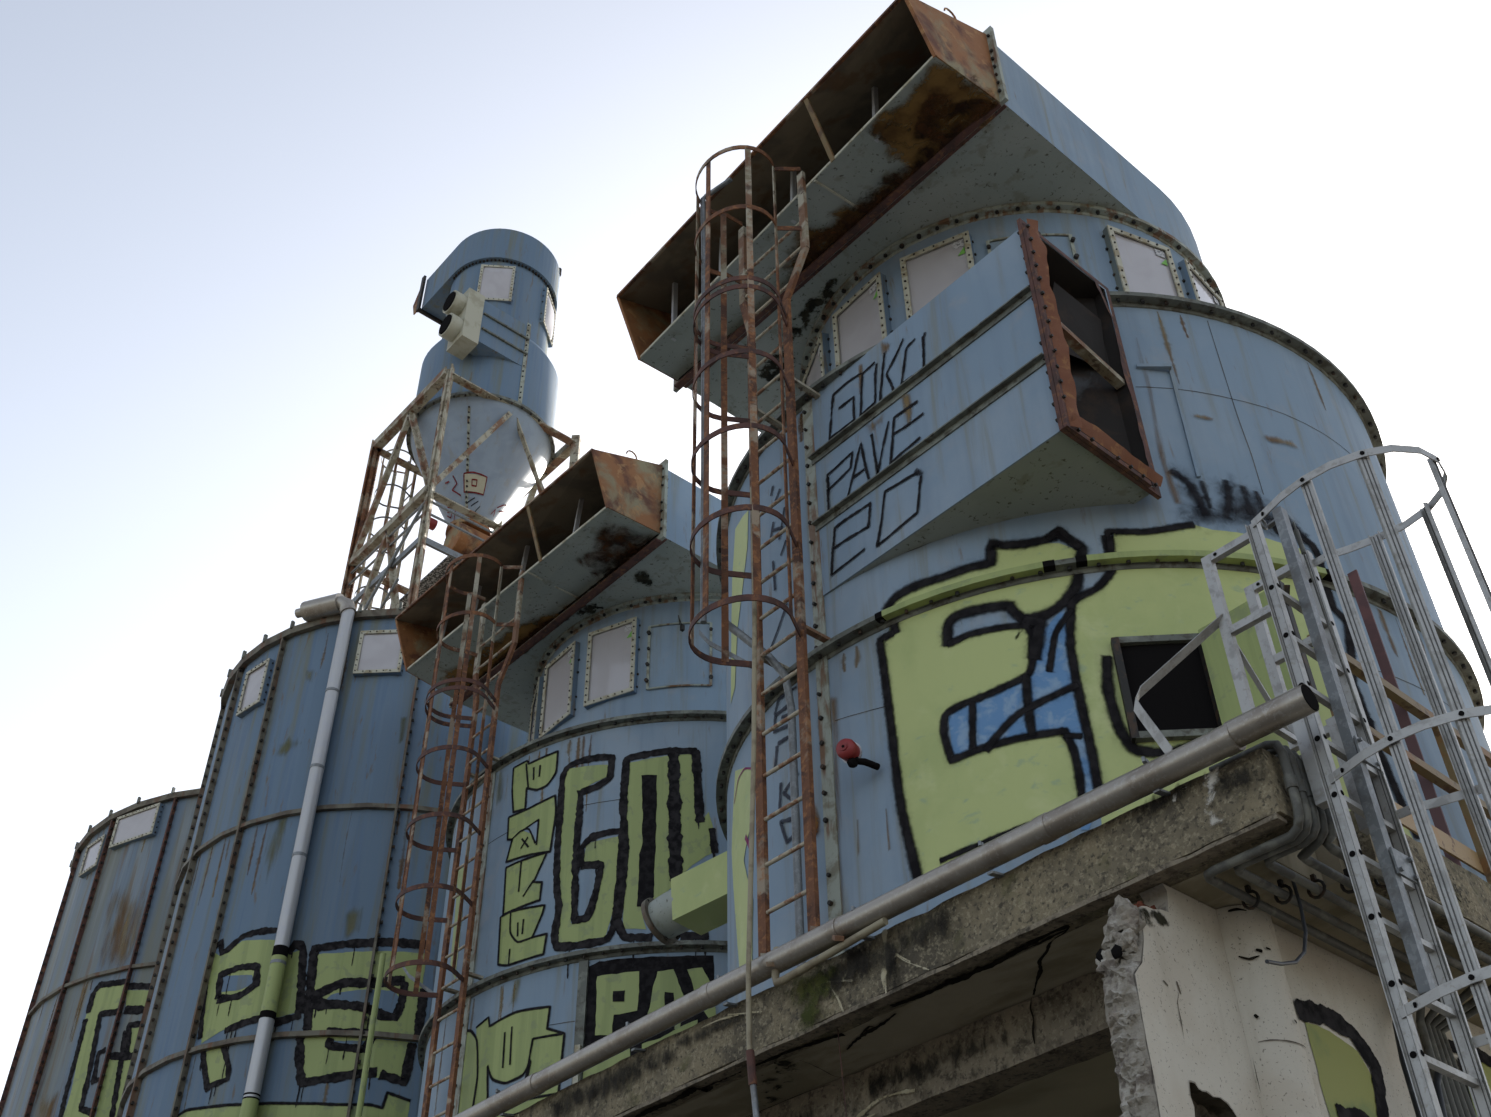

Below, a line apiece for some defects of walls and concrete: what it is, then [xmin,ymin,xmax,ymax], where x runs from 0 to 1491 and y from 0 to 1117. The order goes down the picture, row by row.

rust [783,64,997,272]
leakage [829,910,947,1012]
leakage [869,1030,1007,1098]
crack [1024,927,1070,1044]
spalling [1095,895,1159,1117]
spalling [1189,1080,1237,1117]